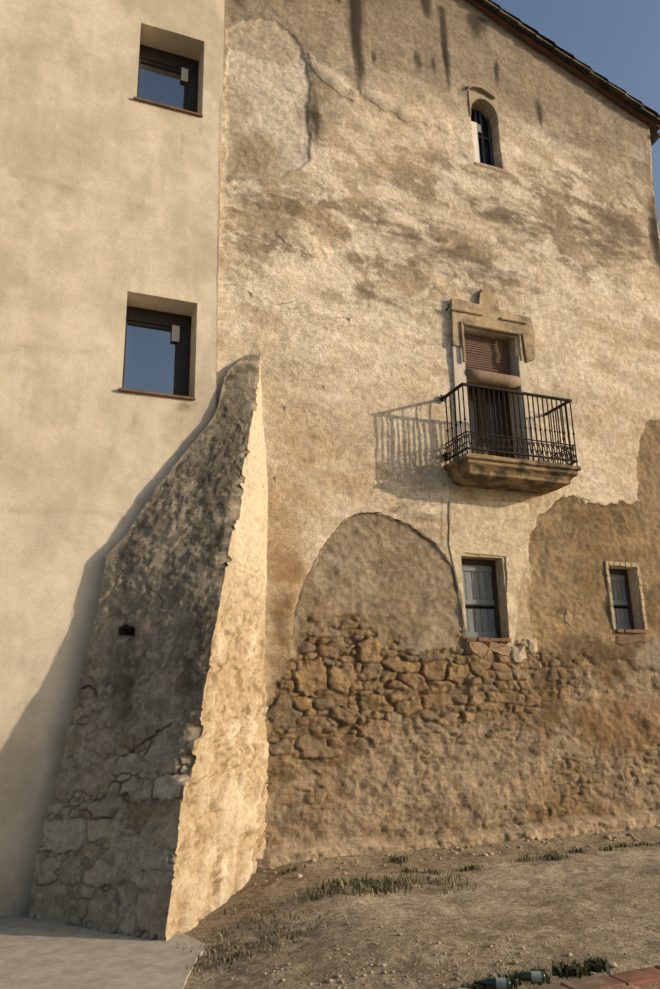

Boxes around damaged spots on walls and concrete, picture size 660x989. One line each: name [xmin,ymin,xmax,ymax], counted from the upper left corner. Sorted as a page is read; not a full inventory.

leakage [339,0,376,75]
leakage [422,0,449,72]
leakage [310,99,321,135]
flaking render [256,420,660,872]
crack [131,721,176,762]